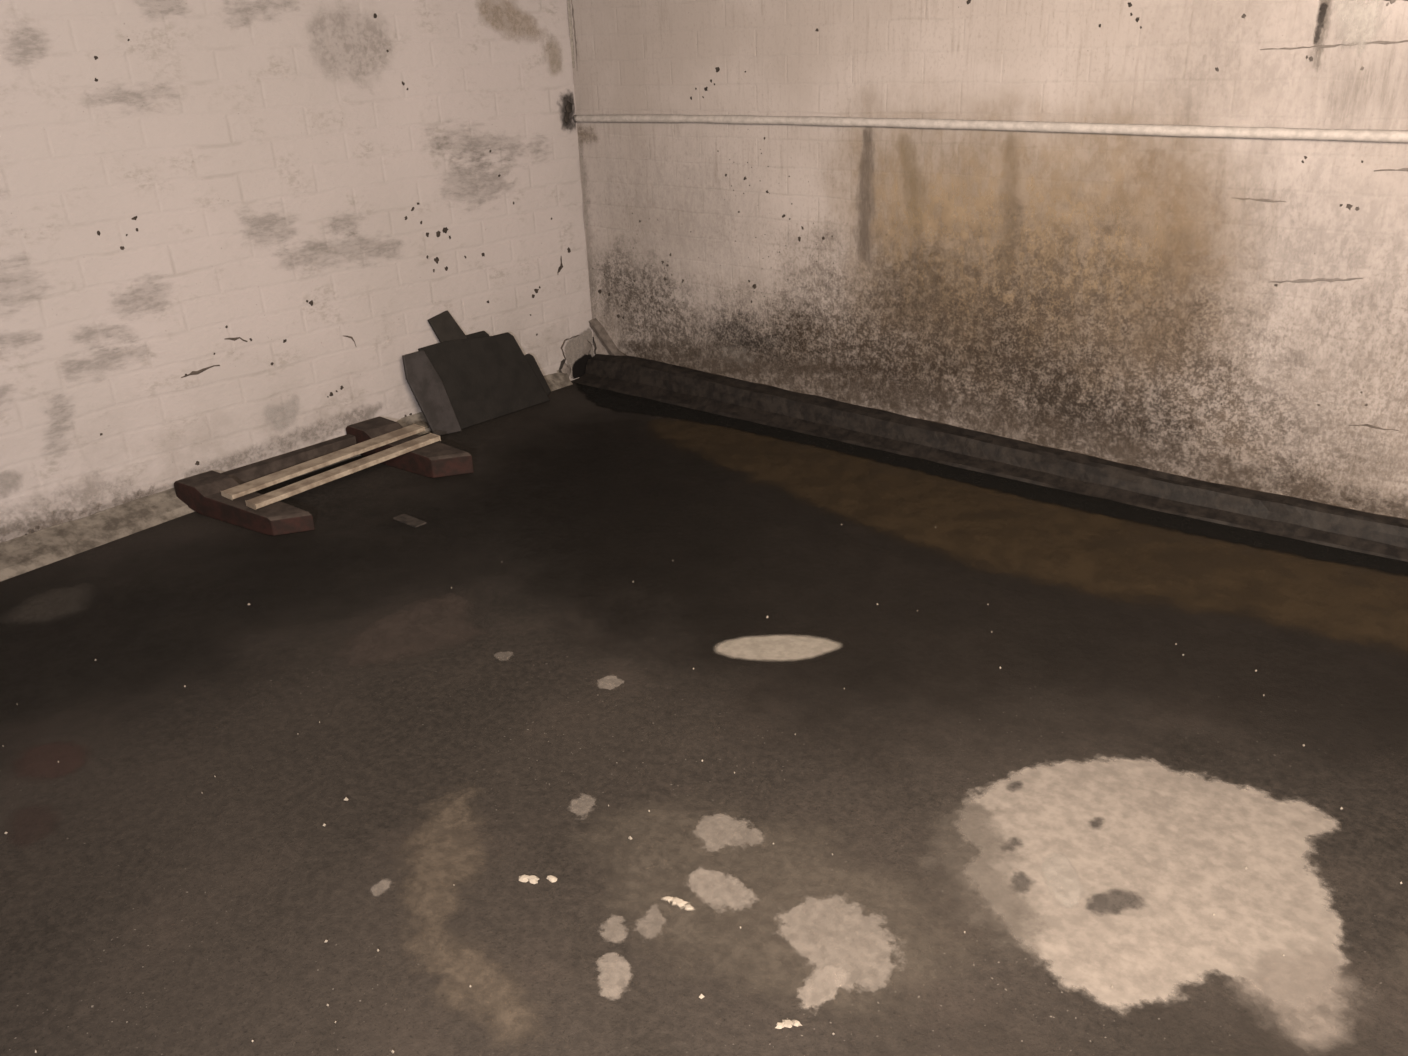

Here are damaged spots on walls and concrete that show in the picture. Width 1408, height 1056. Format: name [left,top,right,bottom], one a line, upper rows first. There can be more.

water stain [592,131,1325,501]
water stain [547,379,1408,727]